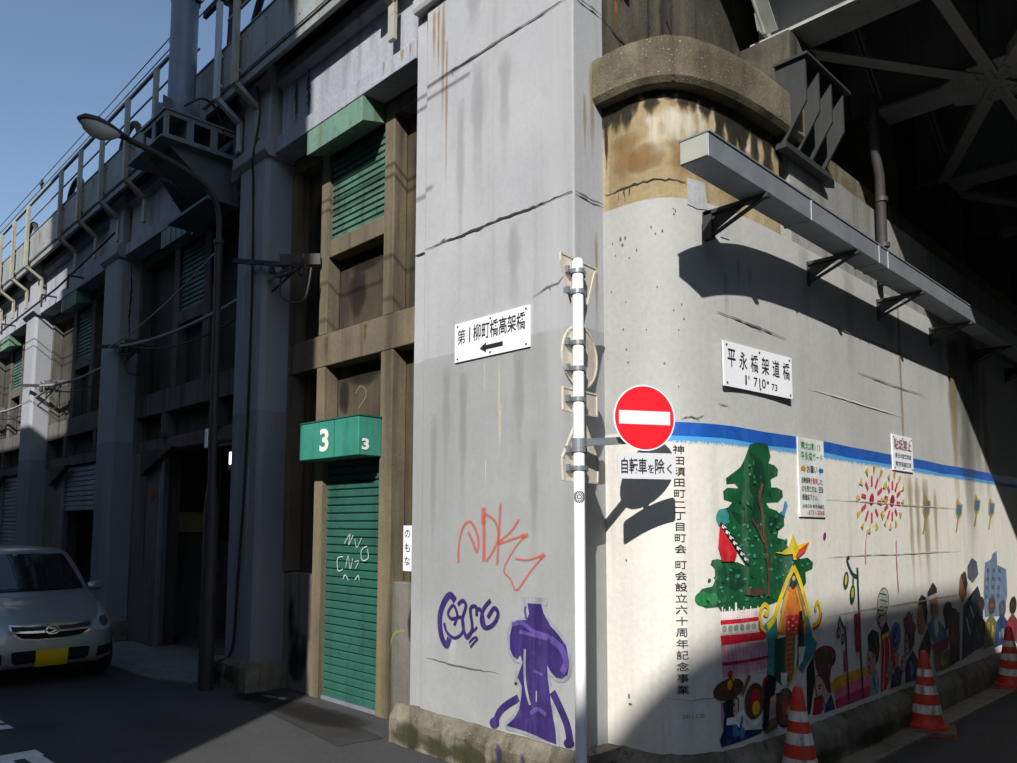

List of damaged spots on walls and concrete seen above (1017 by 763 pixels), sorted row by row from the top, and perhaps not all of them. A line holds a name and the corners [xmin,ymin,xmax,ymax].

crack [428,0,627,86]
leakage [602,89,783,171]
crack [415,178,686,256]
leakage [289,600,306,679]